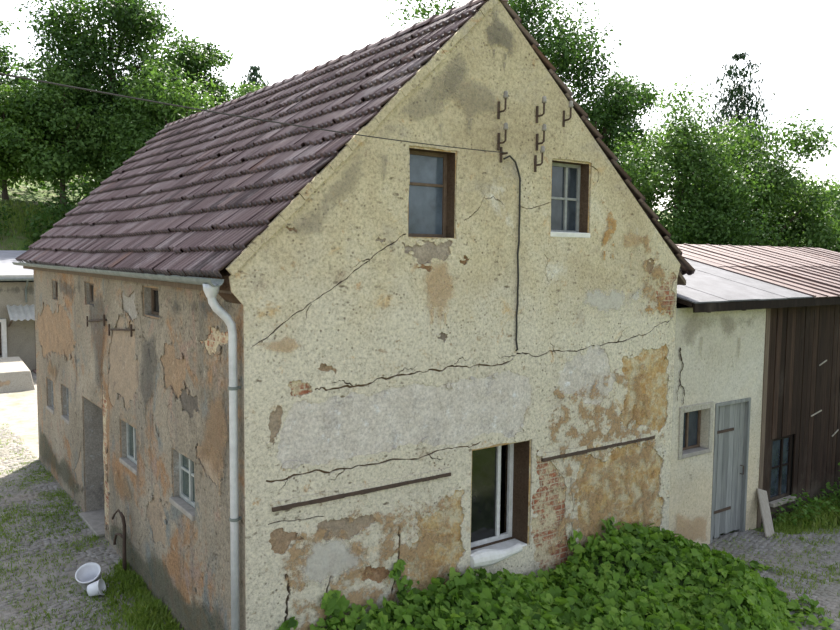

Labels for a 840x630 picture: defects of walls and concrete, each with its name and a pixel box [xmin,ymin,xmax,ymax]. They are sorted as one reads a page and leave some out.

crack [253,234,406,346]
flaking render [402,240,452,272]
flaking render [103,292,140,529]
flaking render [266,405,282,446]
crack [315,321,666,391]
flaking render [557,344,673,433]
crack [677,348,685,405]
crack [266,441,481,483]
flaking render [268,528,304,554]
flaking render [317,514,375,541]
flaking render [405,489,465,593]
flaking render [530,442,663,572]